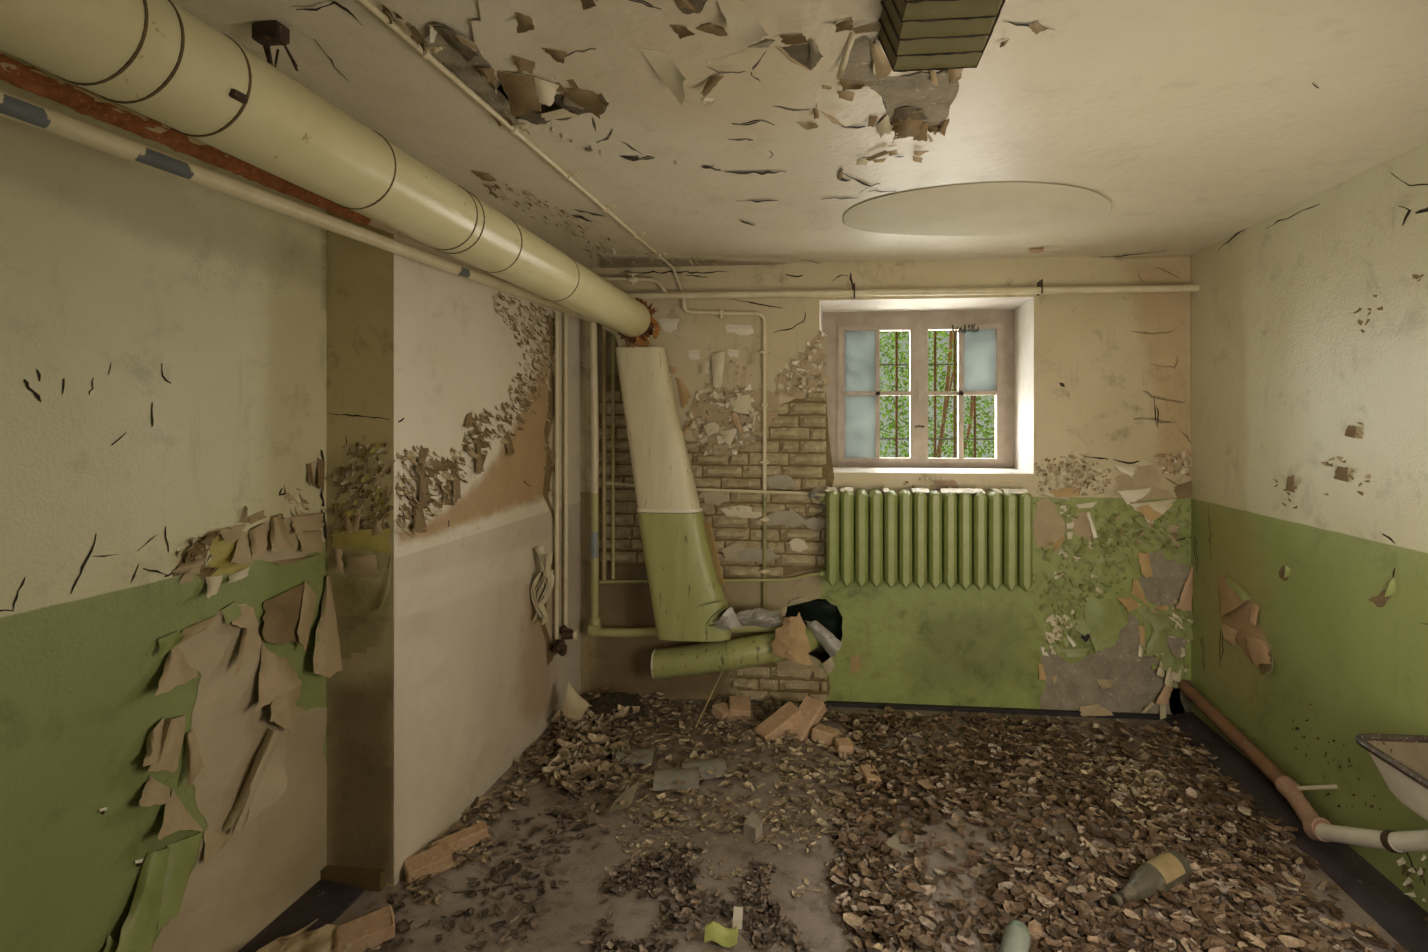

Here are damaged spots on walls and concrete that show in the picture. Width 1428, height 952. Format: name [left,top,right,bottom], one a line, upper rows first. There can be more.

peeling [381,4,613,152]
peeling [580,0,596,10]
peeling [639,0,823,106]
peeling [796,17,963,144]
peeling [1028,22,1047,35]
peeling [103,291,556,952]
flaking render [598,373,646,569]
flaking render [668,325,851,703]
peeling [1033,449,1194,720]
peeling [1218,574,1274,675]